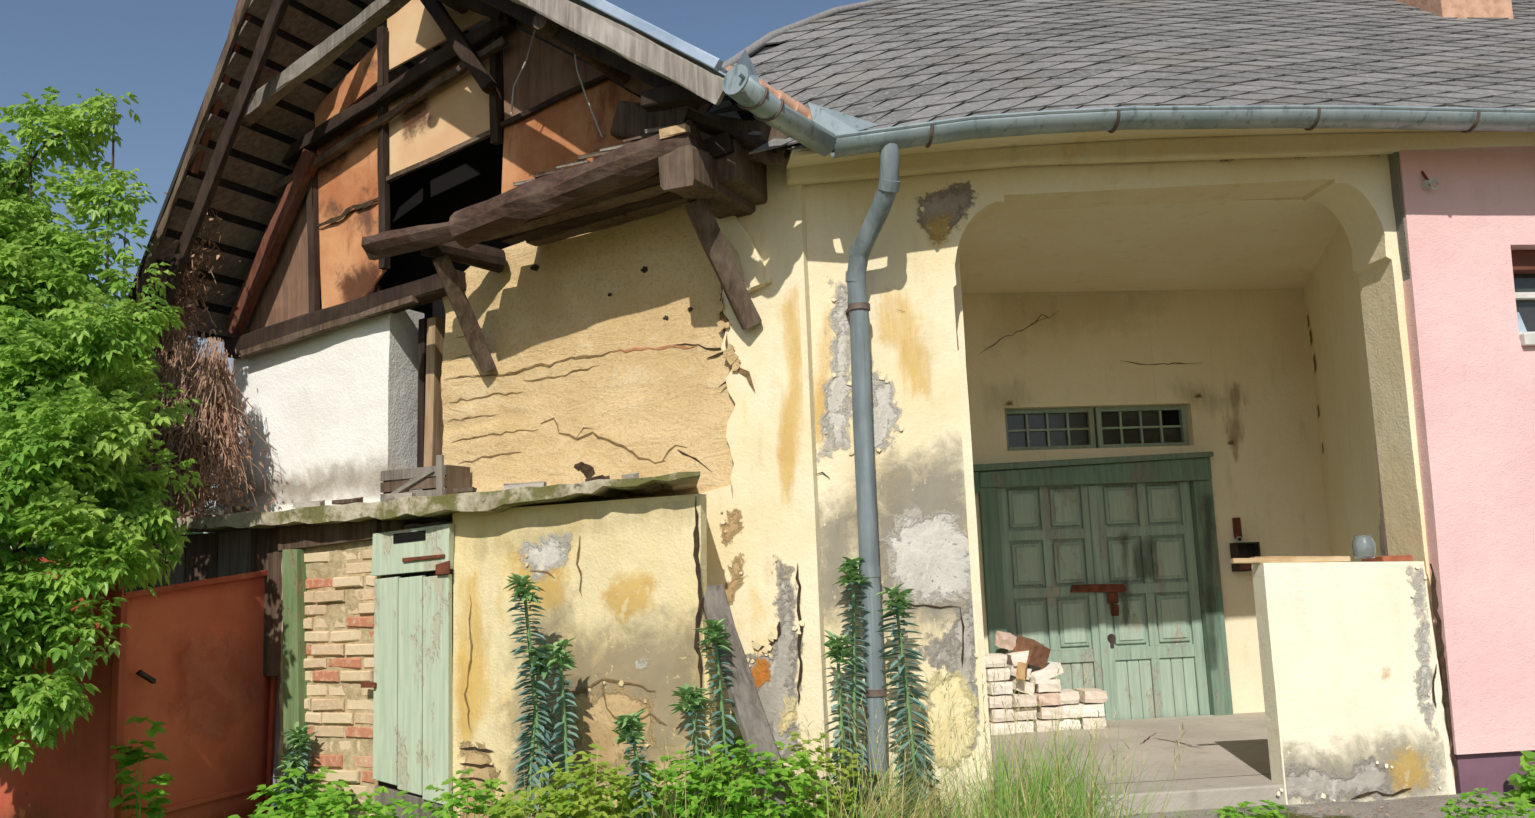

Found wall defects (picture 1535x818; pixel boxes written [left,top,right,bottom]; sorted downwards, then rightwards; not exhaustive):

crack [489,286,755,391]
peeling [816,280,854,462]
crack [464,598,473,731]
crack [530,536,582,595]
leakage [514,556,699,802]
crack [564,678,666,745]
crack [542,418,708,692]
spalling [720,508,748,605]
peeling [746,555,805,761]
peeling [878,506,981,759]
leakage [1284,739,1441,802]
peeling [1406,565,1442,789]